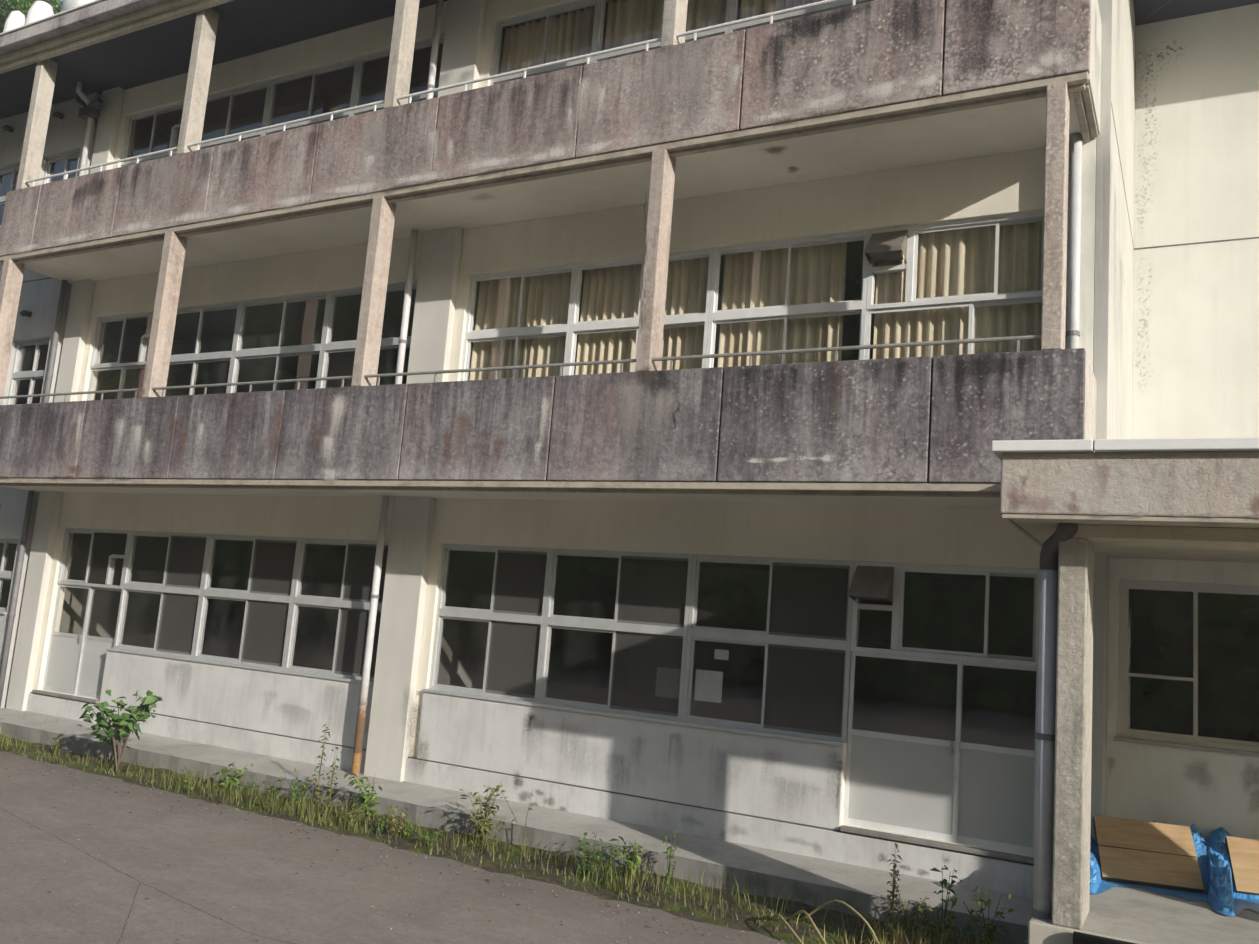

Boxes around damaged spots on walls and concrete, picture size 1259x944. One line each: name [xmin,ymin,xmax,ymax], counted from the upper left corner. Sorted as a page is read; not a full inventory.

water stain [1024,49,1070,76]
water stain [568,78,605,130]
water stain [753,72,938,122]
water stain [274,118,613,207]
water stain [12,233,94,253]
water stain [110,205,252,233]
water stain [116,419,150,464]
water stain [323,396,346,481]
water stain [534,397,550,462]
water stain [748,454,833,463]